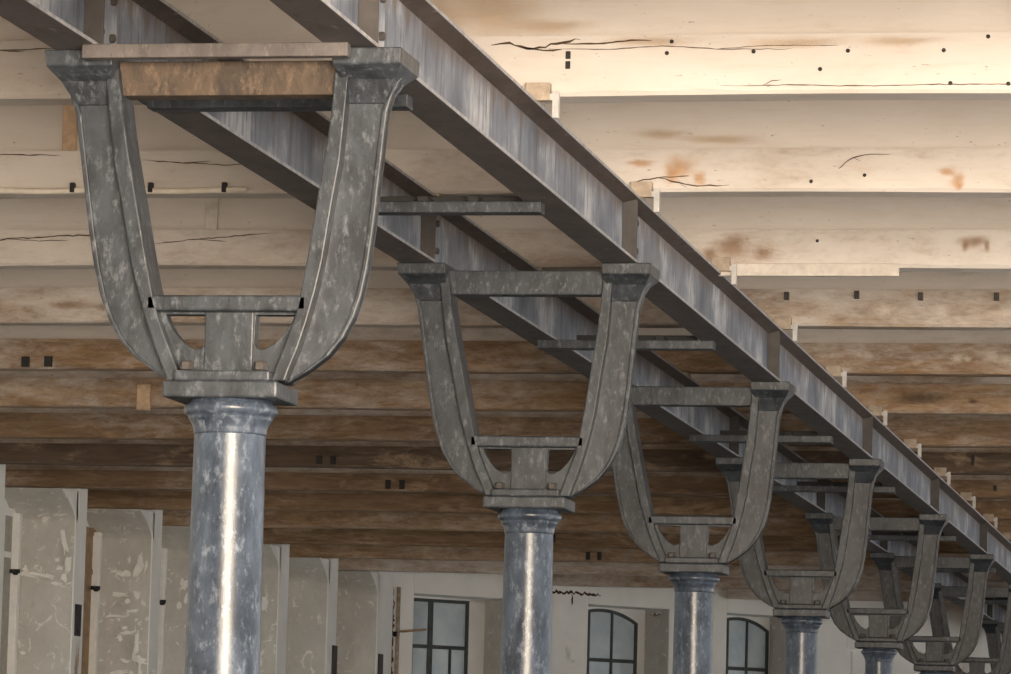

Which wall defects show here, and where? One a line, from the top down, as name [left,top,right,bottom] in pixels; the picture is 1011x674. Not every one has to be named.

crack [493,39,834,51]
crack [720,79,1011,87]
rust [621,151,707,188]
crack [636,176,725,187]
rust [934,167,966,190]